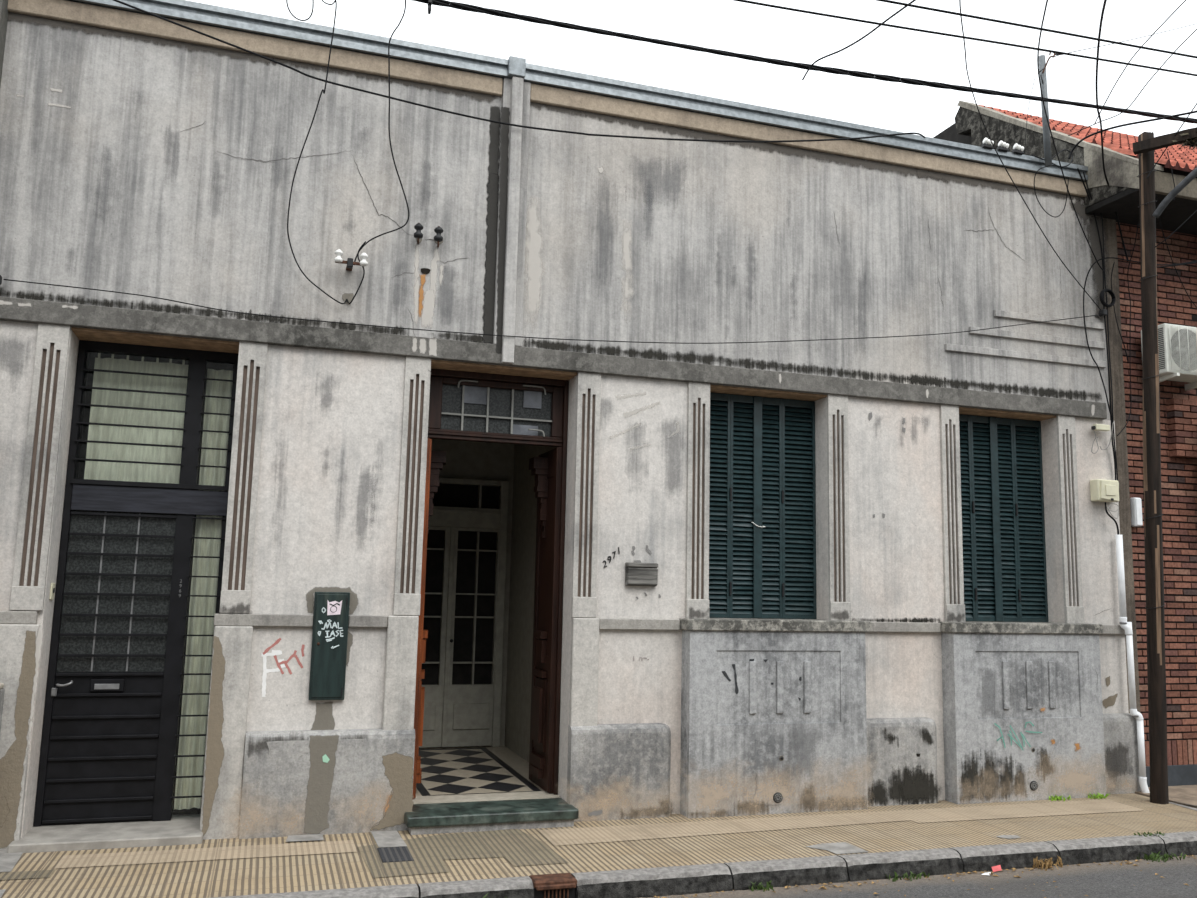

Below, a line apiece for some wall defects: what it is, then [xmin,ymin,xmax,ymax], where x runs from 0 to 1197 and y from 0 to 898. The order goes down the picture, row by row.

leakage [0,12,510,356]
leakage [531,102,1109,321]
leakage [525,198,543,314]
flaking render [371,752,414,830]
leakage [691,766,941,818]
leakage [960,753,1026,801]
leakage [1038,745,1130,793]